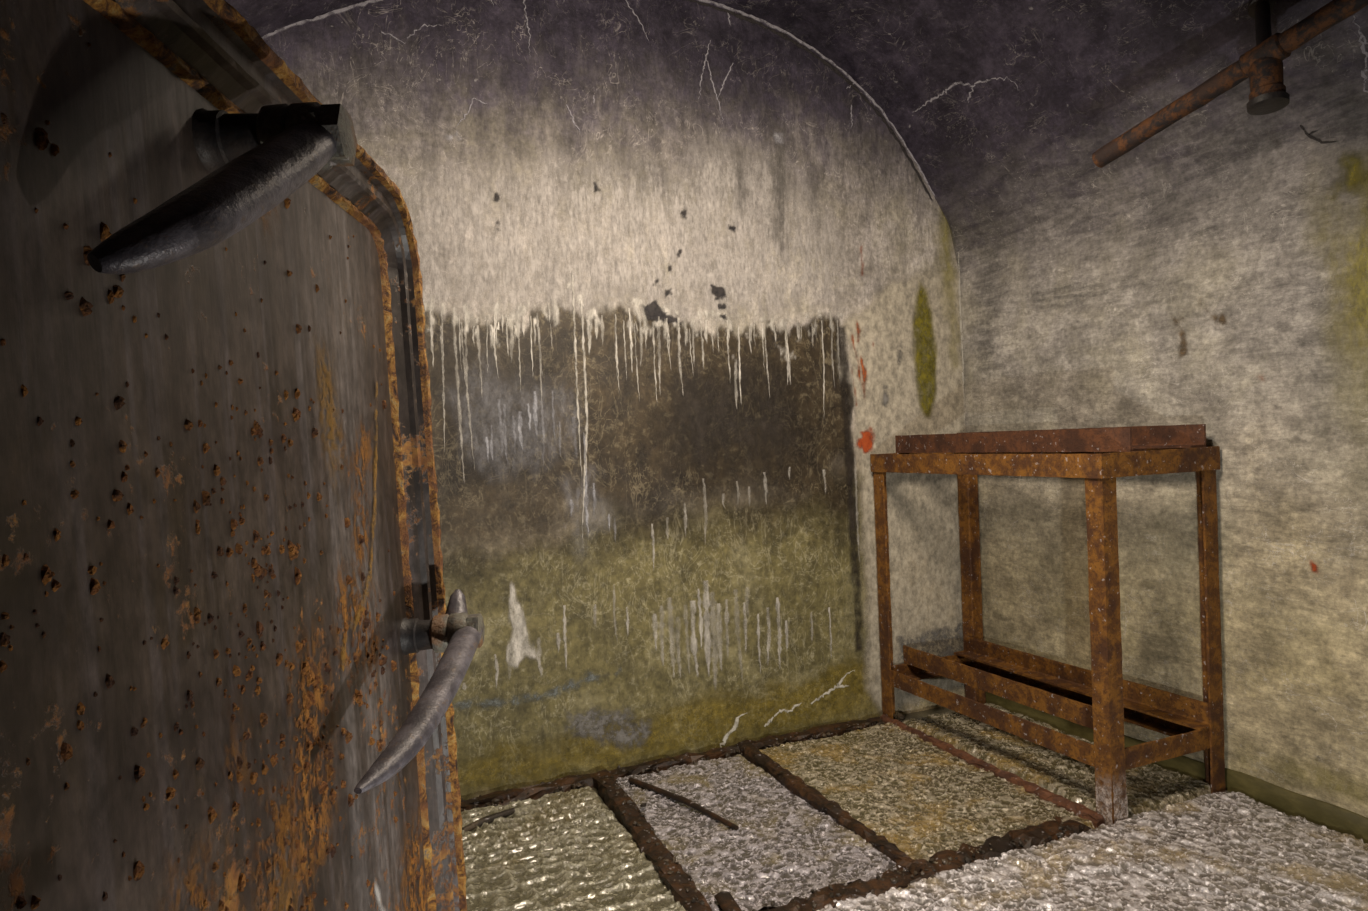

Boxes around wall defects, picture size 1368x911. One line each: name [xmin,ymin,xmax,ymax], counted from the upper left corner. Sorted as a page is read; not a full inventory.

crack [267,0,437,43]
crack [491,0,531,55]
crack [688,0,1018,200]
corrosion [64,274,148,338]
corrosion [97,440,144,529]
corrosion [2,553,62,638]
corrosion [131,359,398,911]
damp [425,306,1368,911]
crack [720,670,855,748]
corrosion [118,752,179,811]
corrosion [394,813,428,911]